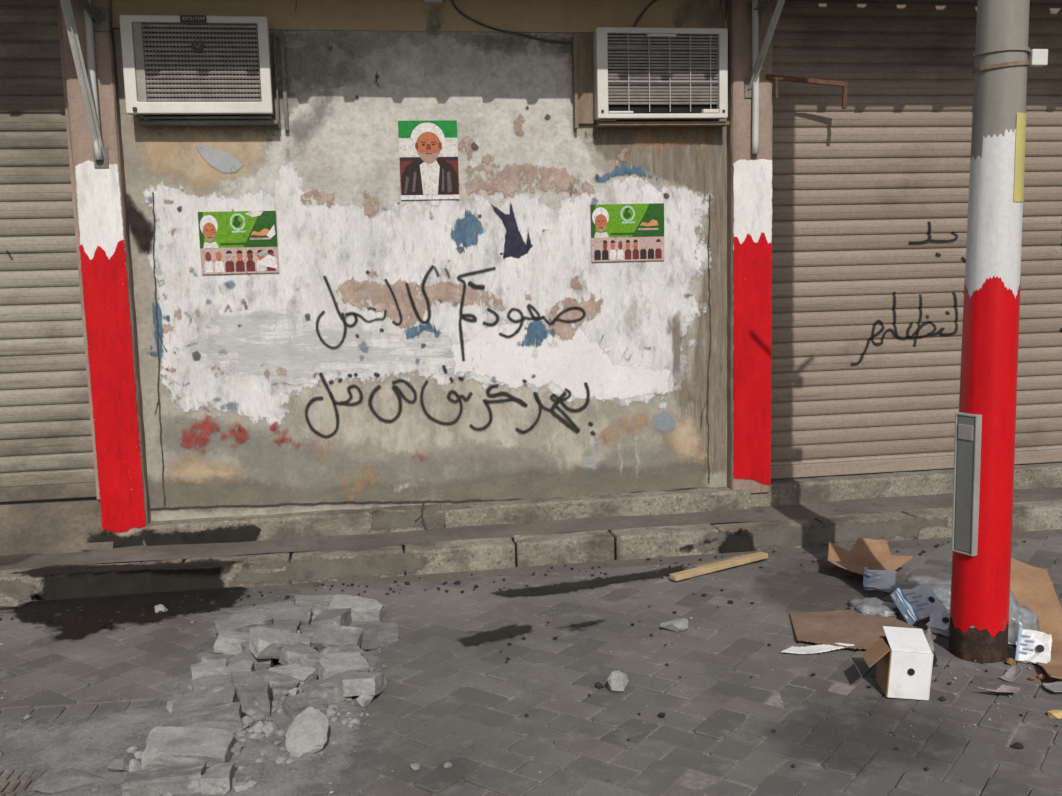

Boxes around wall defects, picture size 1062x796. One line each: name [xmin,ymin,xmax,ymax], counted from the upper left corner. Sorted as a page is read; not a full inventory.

peeling [510,106,529,136]
peeling [131,119,277,189]
peeling [301,189,335,208]
peeling [362,192,386,218]
peeling [458,136,599,259]
peeling [147,311,181,357]
peeling [337,270,506,363]
peeling [548,276,603,341]
peeling [167,396,244,484]
peeling [669,418,706,460]
water stain [84,524,261,551]
water stain [13,558,247,640]